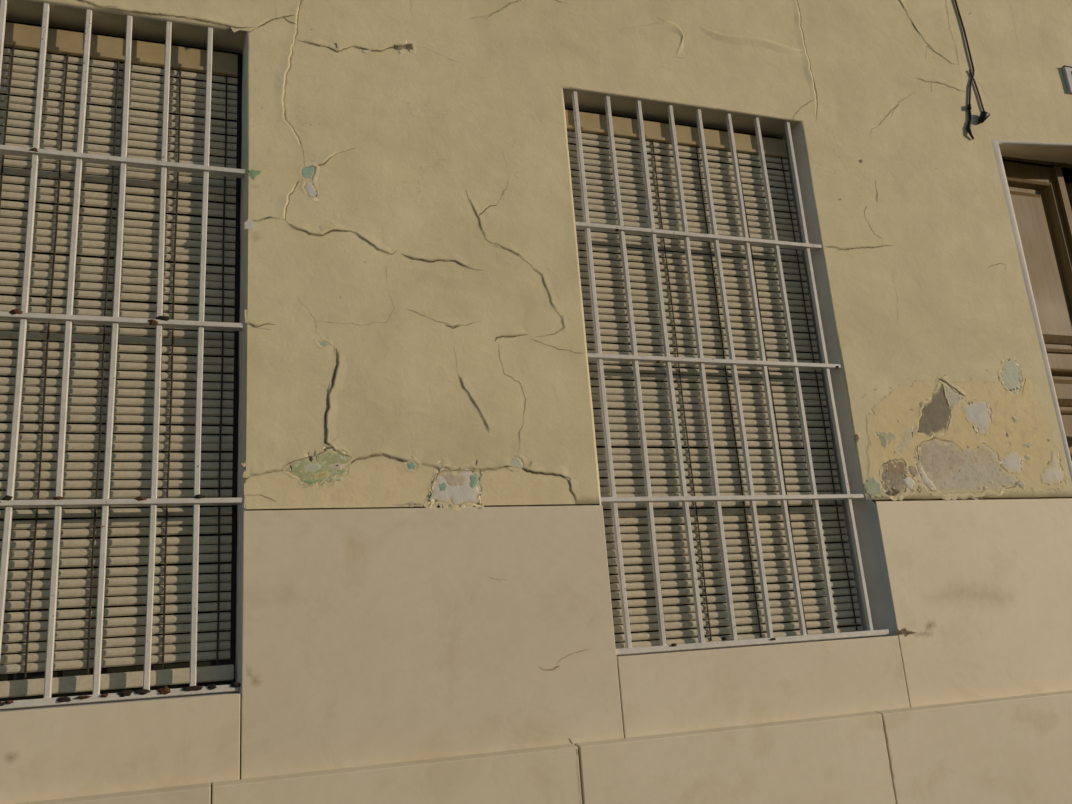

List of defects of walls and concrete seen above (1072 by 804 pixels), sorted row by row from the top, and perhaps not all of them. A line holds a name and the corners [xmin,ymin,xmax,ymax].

crack [791,0,818,120]
crack [324,348,351,457]
peeling [244,443,581,512]
peeling [864,374,1024,501]
peeling [997,354,1026,395]
corrosion [57,684,217,702]